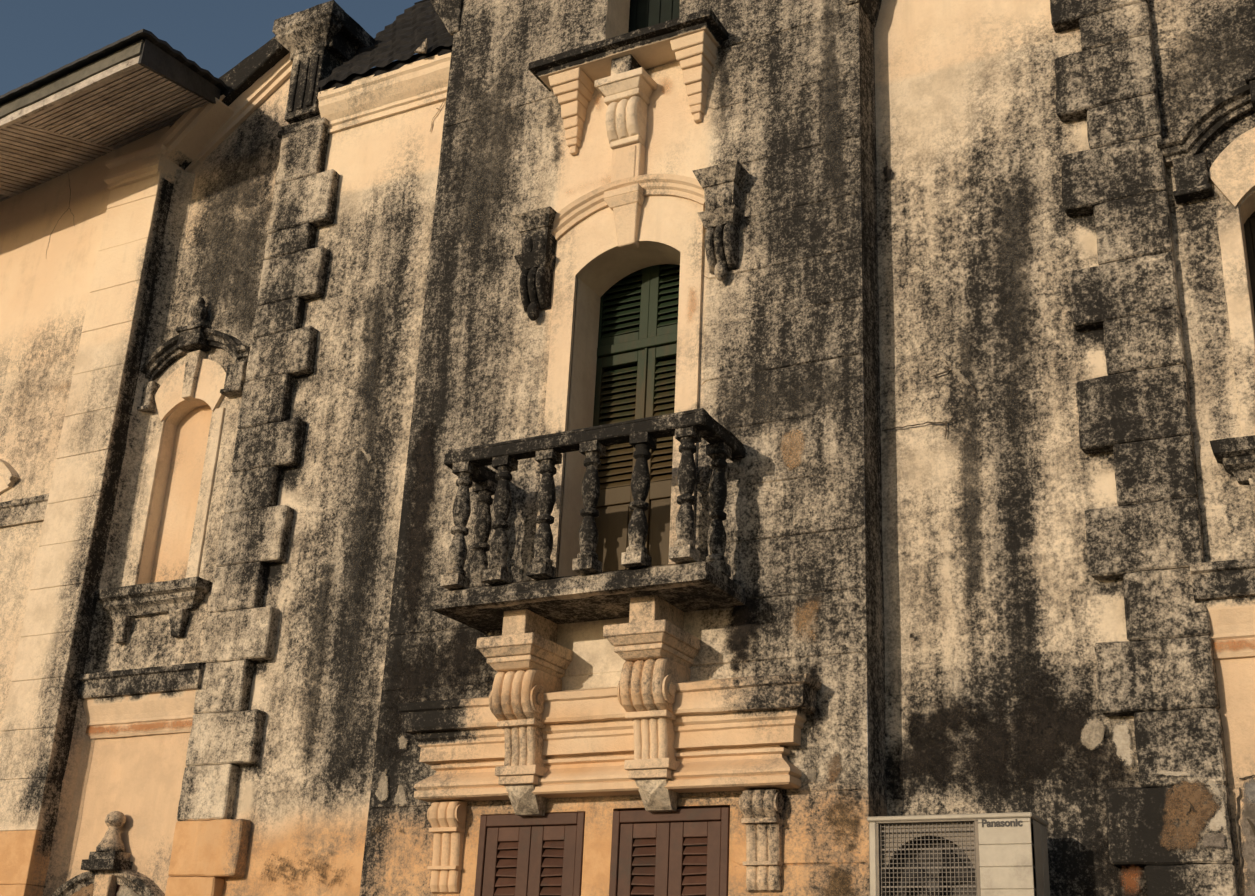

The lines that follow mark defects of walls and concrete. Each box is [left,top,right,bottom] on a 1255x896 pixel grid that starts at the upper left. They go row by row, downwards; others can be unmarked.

leakage [192,123,272,363]
leakage [551,174,705,241]
leakage [140,331,187,382]
leakage [955,319,984,604]
leakage [300,285,388,778]
leakage [378,418,494,758]
leakage [722,591,761,672]
leakage [414,759,510,803]
leakage [531,752,640,798]
leakage [664,744,802,793]
leakage [885,582,1135,896]
flaking render [1152,770,1255,896]